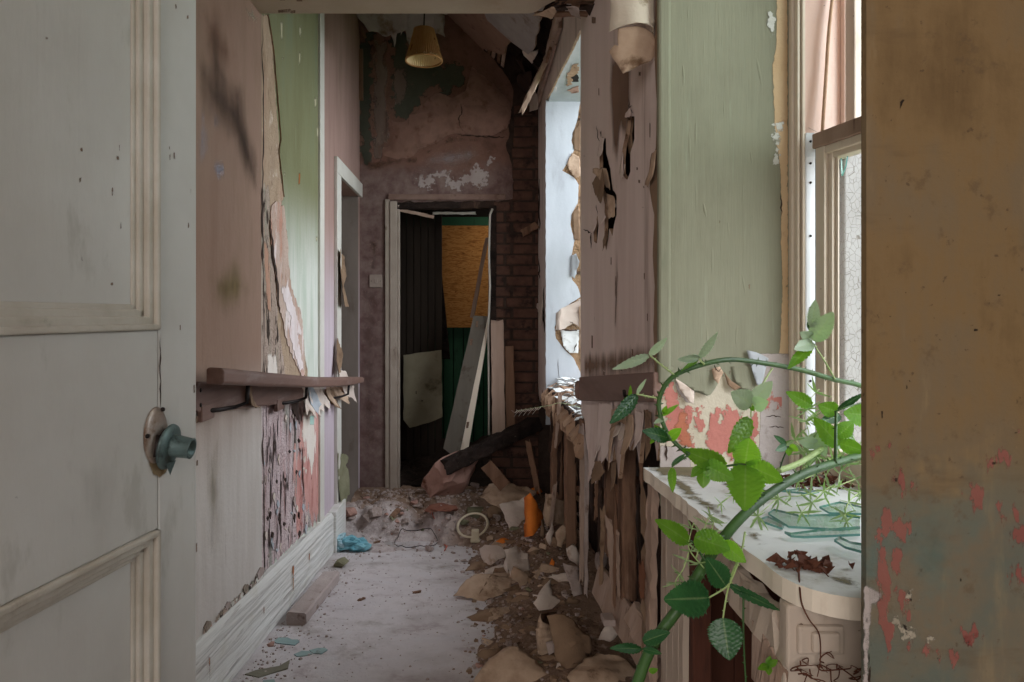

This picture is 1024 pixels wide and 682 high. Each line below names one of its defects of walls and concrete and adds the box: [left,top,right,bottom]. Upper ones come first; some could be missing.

spalling [533,0,596,24]
peeling [767,11,776,35]
spalling [485,45,543,93]
peeling [771,122,784,165]
spalling [262,0,308,376]
peeling [415,156,495,191]
peeling [636,118,657,372]
peeling [863,507,984,682]